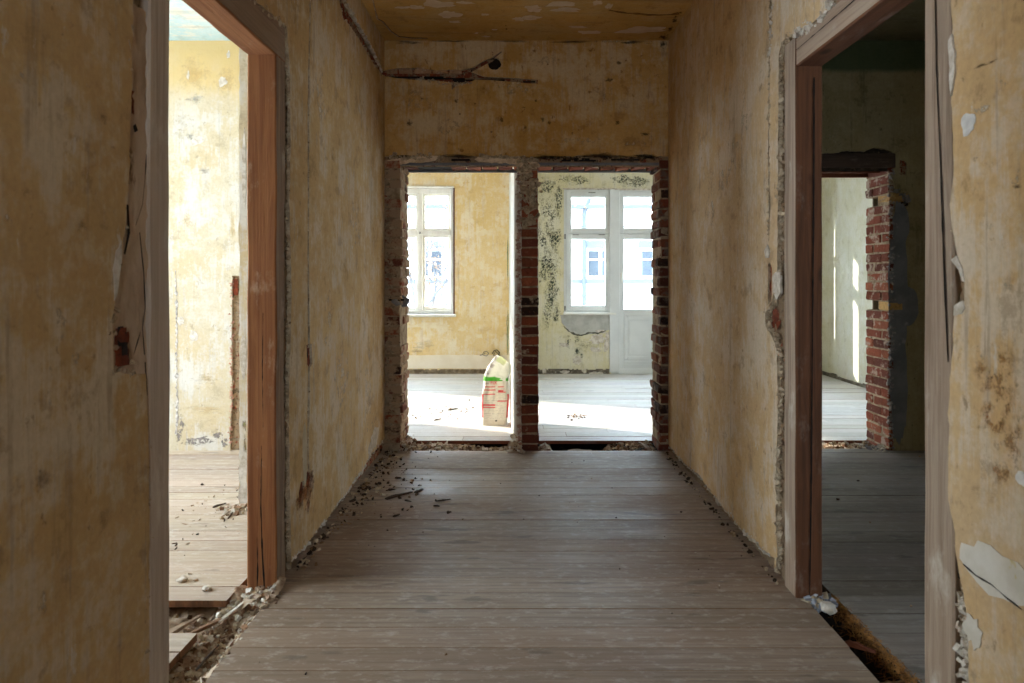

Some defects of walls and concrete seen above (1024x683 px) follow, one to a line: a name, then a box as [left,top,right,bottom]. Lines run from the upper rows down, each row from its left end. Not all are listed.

peeling [395,0,489,23]
spalling [488,58,501,70]
spalling [948,34,956,96]
flaking render [961,113,976,137]
spalling [108,4,149,427]
water stain [539,176,585,323]
spalling [668,0,840,581]
spalling [950,230,965,316]
flaking render [559,315,609,374]
flaking render [952,540,1024,683]